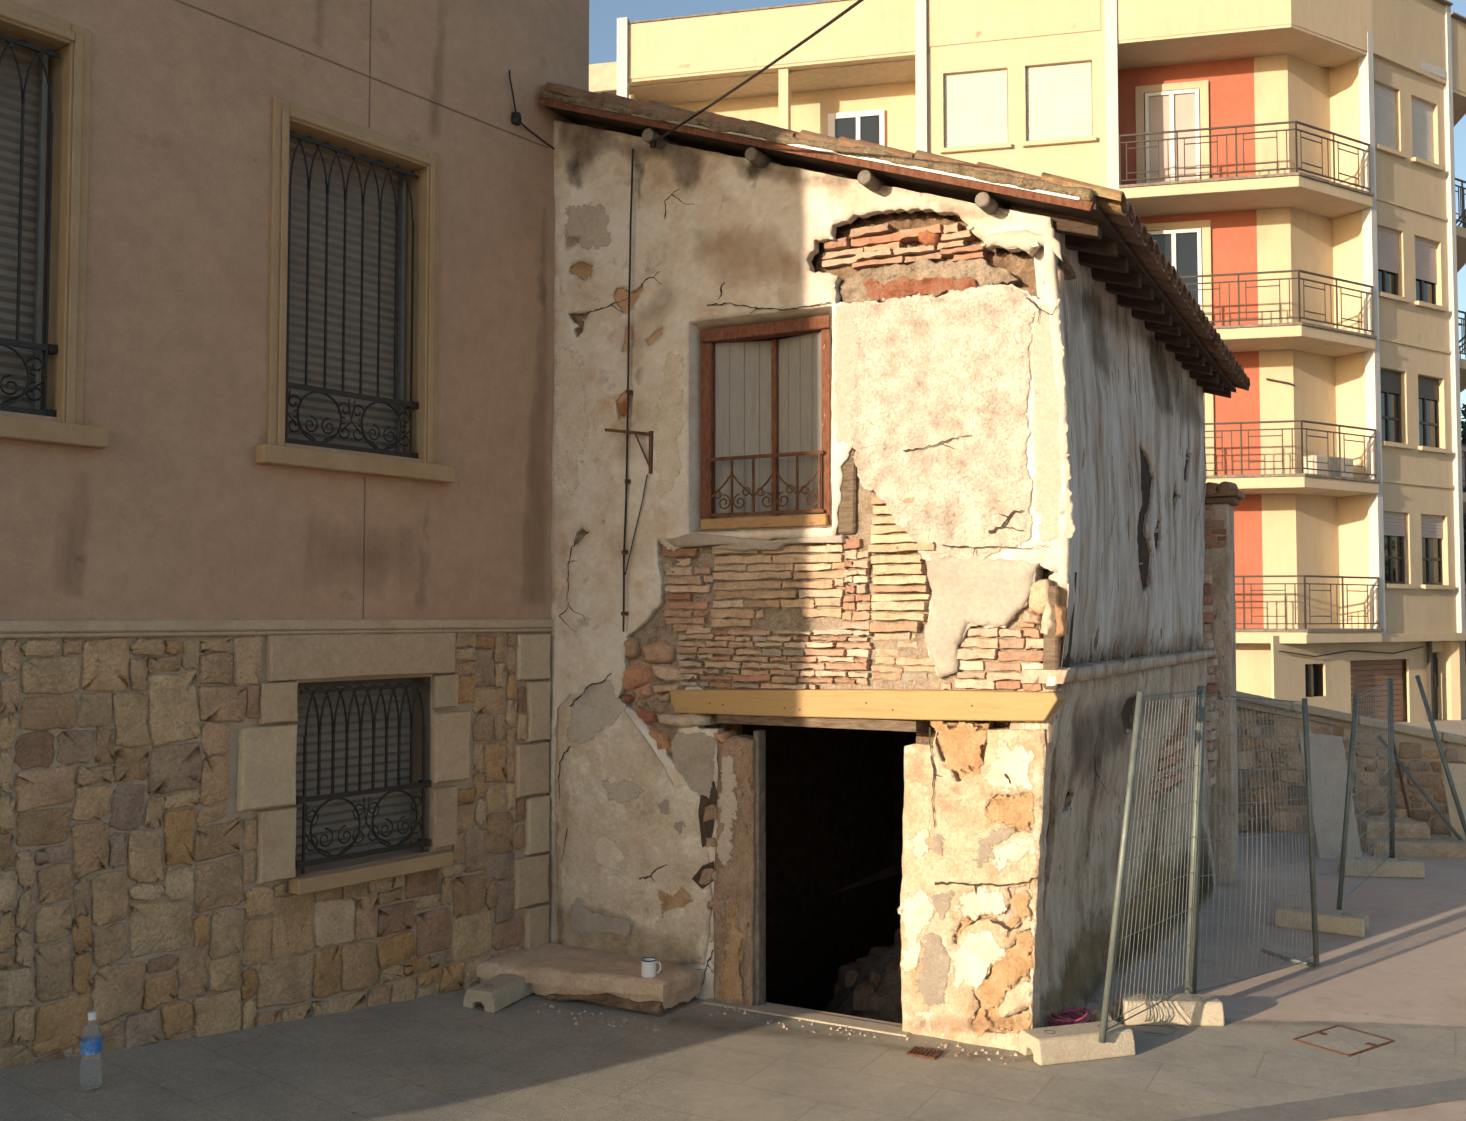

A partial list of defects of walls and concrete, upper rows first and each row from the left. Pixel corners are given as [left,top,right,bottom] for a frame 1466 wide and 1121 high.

spalling [570,311,590,336]
spalling [570,262,593,281]
crack [587,271,661,313]
spalling [614,212,1077,757]
crack [559,542,586,632]
spalling [930,720,994,781]
spalling [692,781,718,889]
leakage [1045,828,1213,1025]